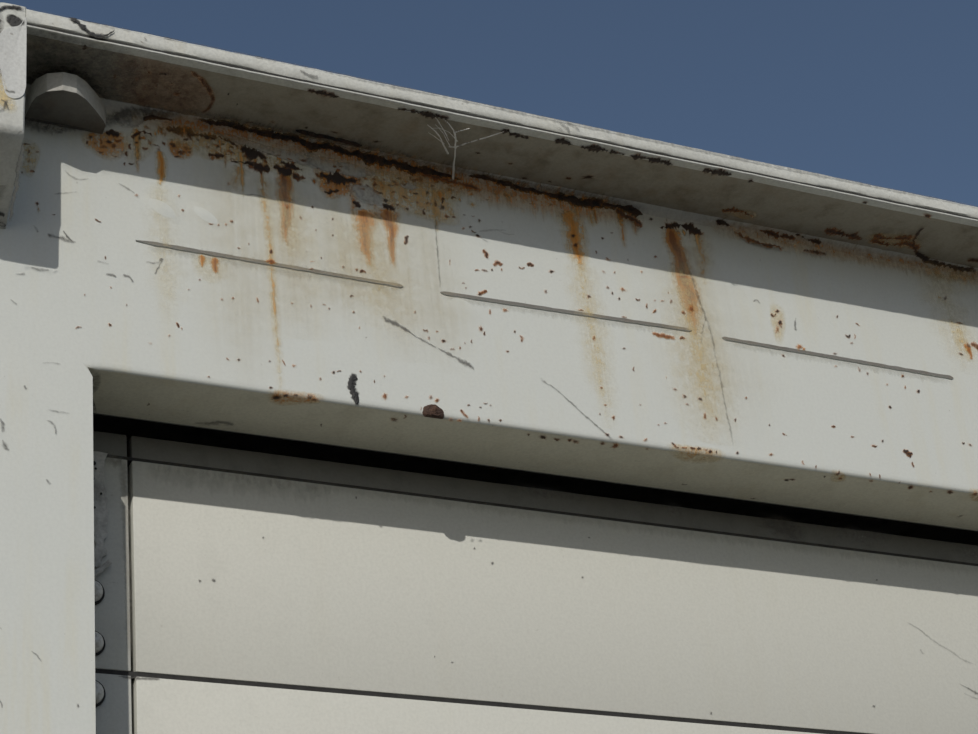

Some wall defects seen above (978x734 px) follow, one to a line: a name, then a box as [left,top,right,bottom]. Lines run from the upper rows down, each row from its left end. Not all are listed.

corrosion [86,67,705,339]
corrosion [716,207,927,271]
corrosion [270,386,316,403]